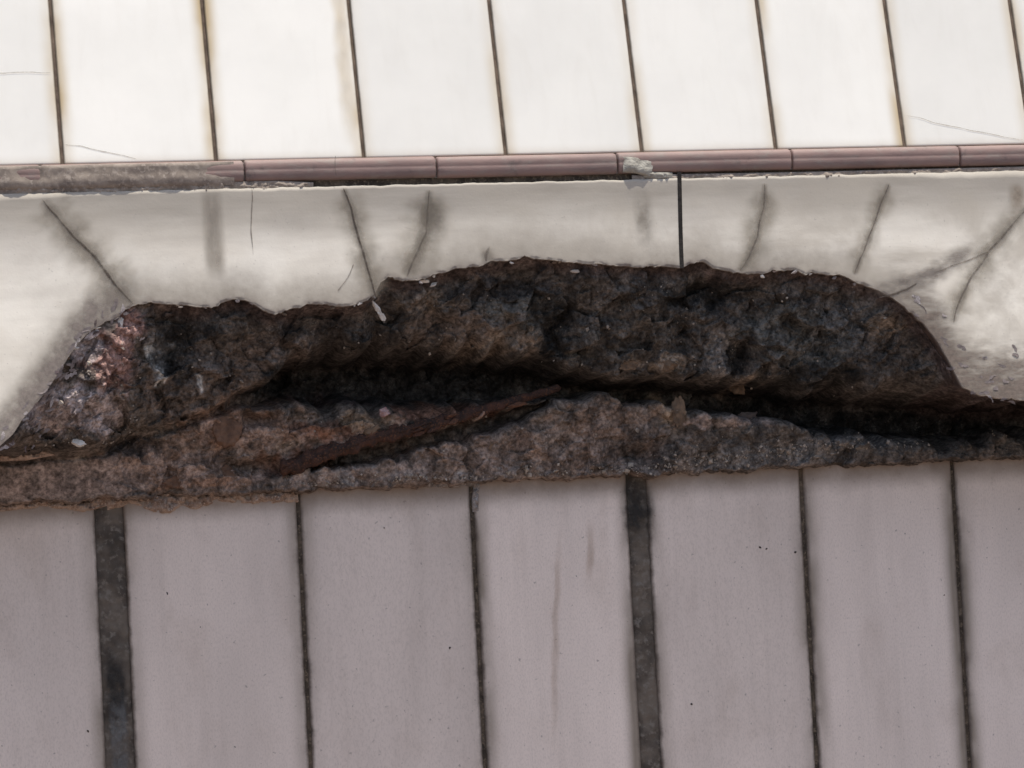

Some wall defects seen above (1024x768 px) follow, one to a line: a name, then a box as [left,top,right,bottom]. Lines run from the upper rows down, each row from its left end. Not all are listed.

crack [44,202,131,302]
crack [335,156,375,293]
crack [937,212,1024,319]
spalling [0,256,1024,514]